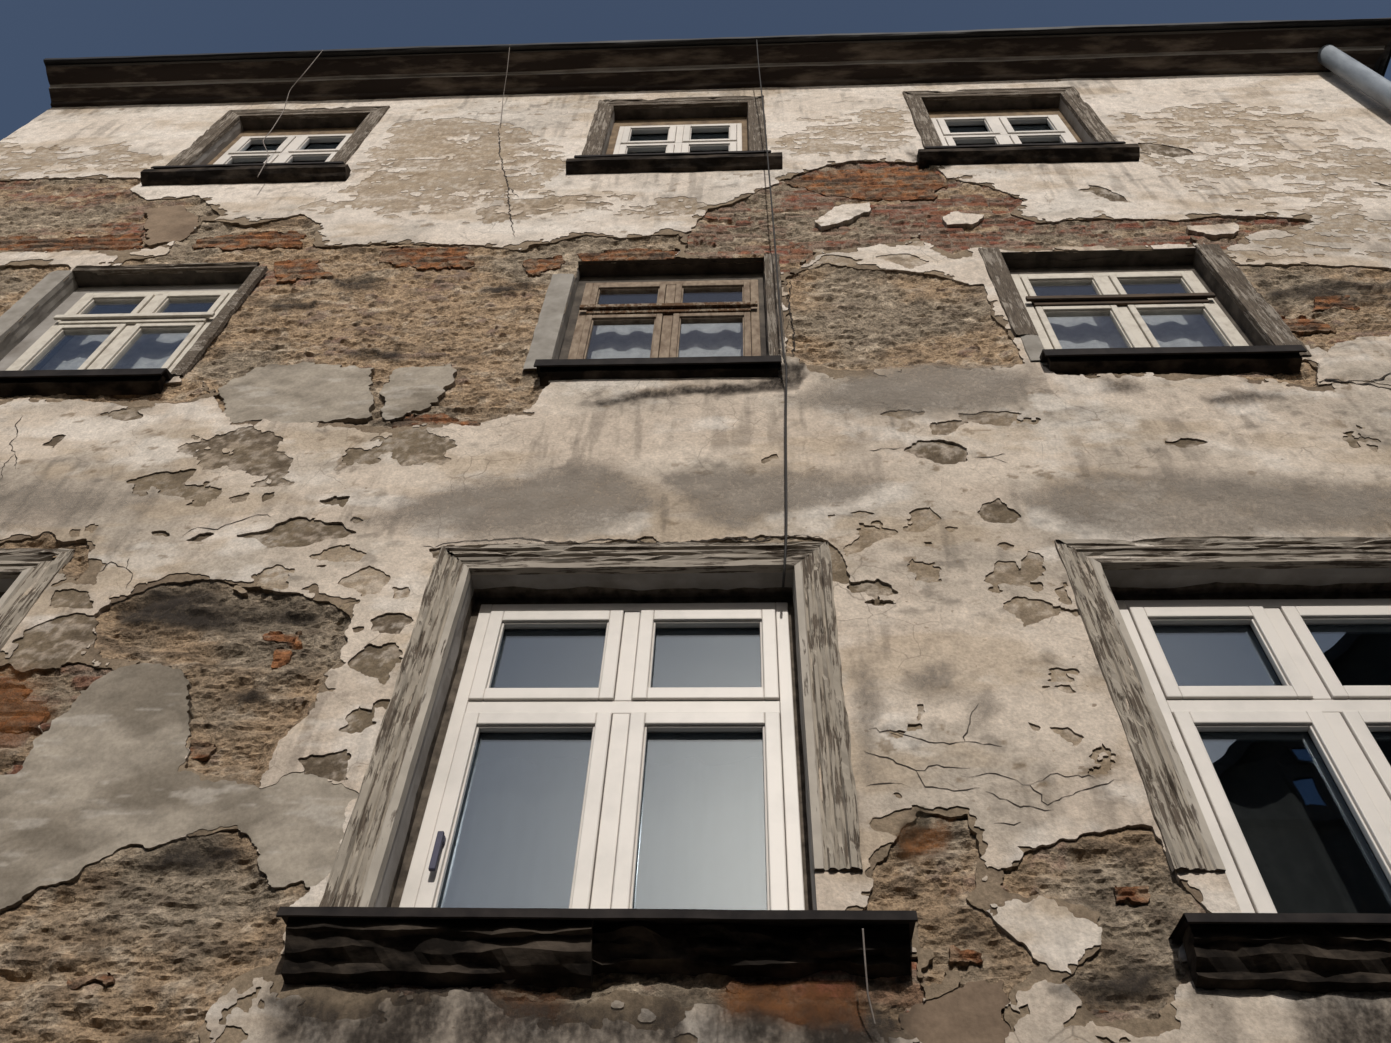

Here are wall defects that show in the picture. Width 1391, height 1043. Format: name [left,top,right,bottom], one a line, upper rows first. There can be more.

crack [498,129,518,235]
spalling [0,101,1391,507]
damp [388,465,653,536]
damp [665,472,878,527]
damp [1041,473,1391,536]
spalling [0,498,413,788]
crack [864,703,1115,825]
spalling [0,793,1207,1043]